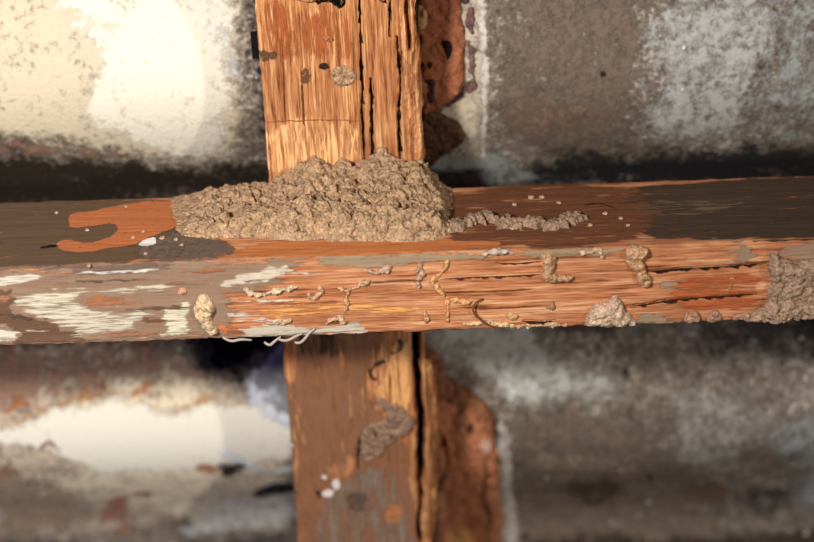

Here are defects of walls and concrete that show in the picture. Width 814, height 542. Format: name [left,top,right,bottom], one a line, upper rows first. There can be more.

damp [0,0,277,203]
crack [271,0,374,159]
crack [389,0,410,158]
damp [430,0,814,187]
peeling [0,330,21,341]
peeling [0,274,40,286]
peeling [14,284,191,337]
peeling [220,265,287,287]
peeling [227,313,368,337]
crack [389,332,426,540]
damp [430,319,814,542]